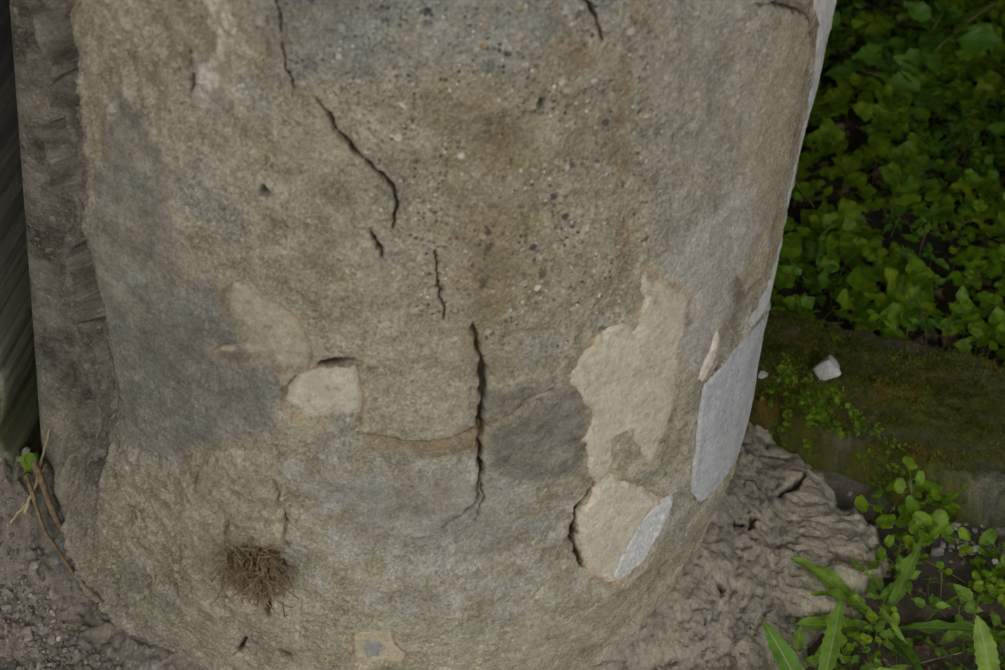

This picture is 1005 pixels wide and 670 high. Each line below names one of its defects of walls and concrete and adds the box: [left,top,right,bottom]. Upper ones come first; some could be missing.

crack [275,0,296,88]
crack [322,104,399,256]
crack [585,0,602,39]
flaking render [787,0,837,209]
spalling [217,282,362,418]
crack [434,250,445,319]
crack [444,323,486,525]
flaking render [569,270,688,582]
flaking render [690,233,783,502]